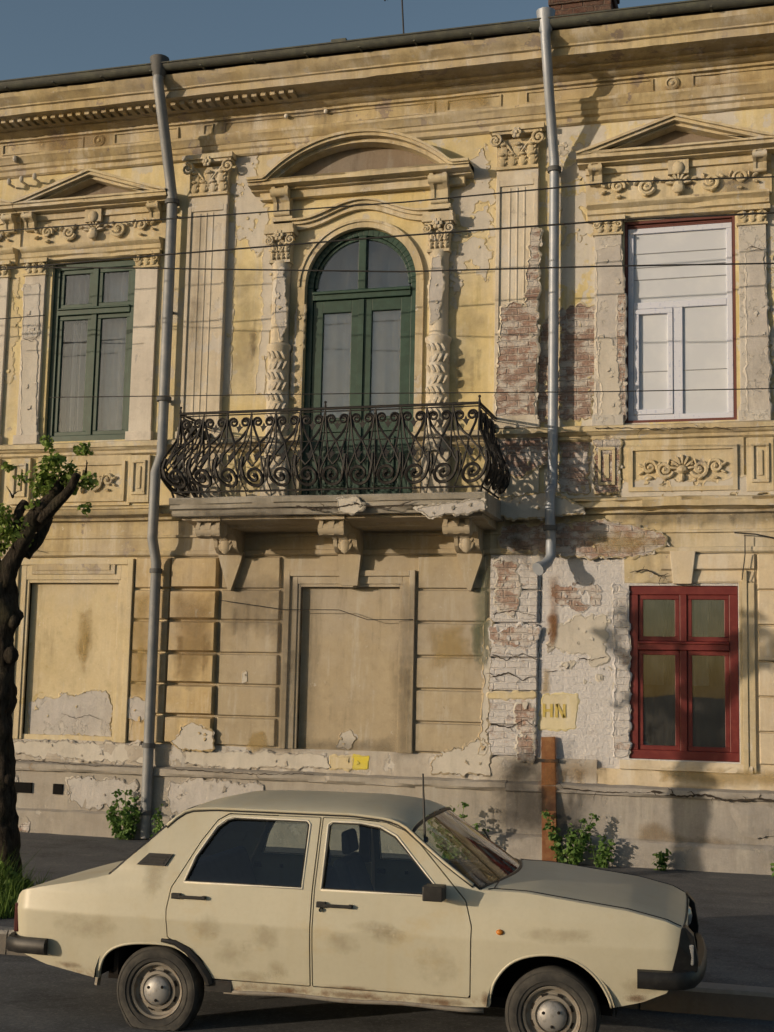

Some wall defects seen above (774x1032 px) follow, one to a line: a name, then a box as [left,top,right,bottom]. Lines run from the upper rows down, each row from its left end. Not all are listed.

peeling [222,155,307,400]
flaking render [427,142,774,778]
spalling [18,815,31,832]
peeling [13,689,145,812]
peeling [163,722,370,815]